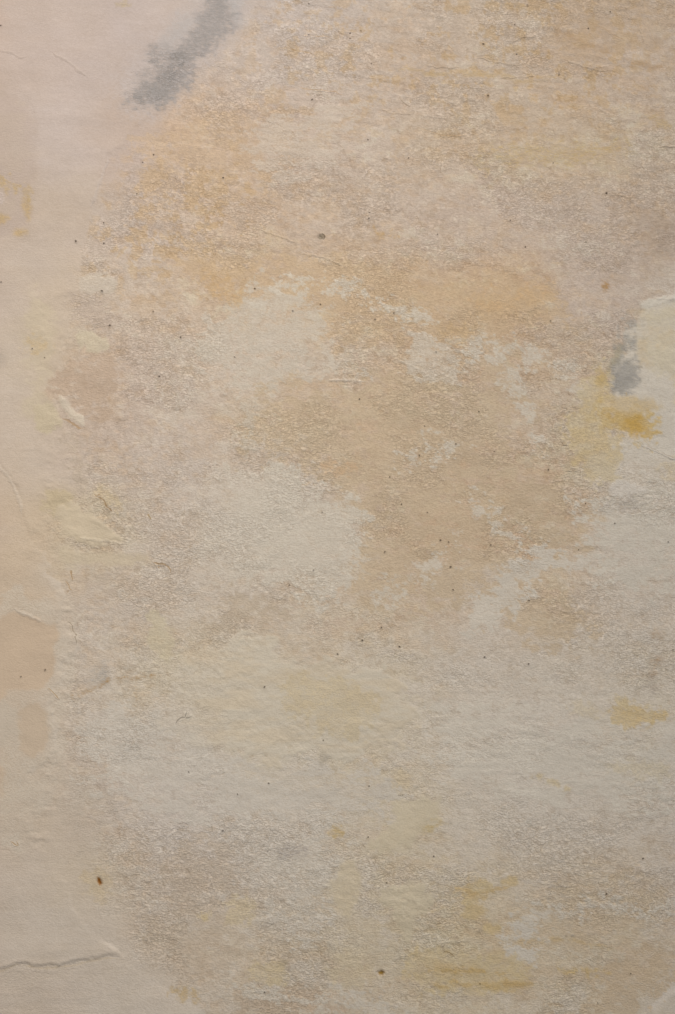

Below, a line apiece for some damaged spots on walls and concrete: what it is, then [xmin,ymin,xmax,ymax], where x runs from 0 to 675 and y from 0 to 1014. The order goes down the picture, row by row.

water stain [96,0,269,137]
peeling [49,340,132,430]
water stain [553,309,675,520]
water stain [274,666,391,771]
water stain [562,693,675,733]
water stain [76,864,121,908]
water stain [318,873,617,1014]